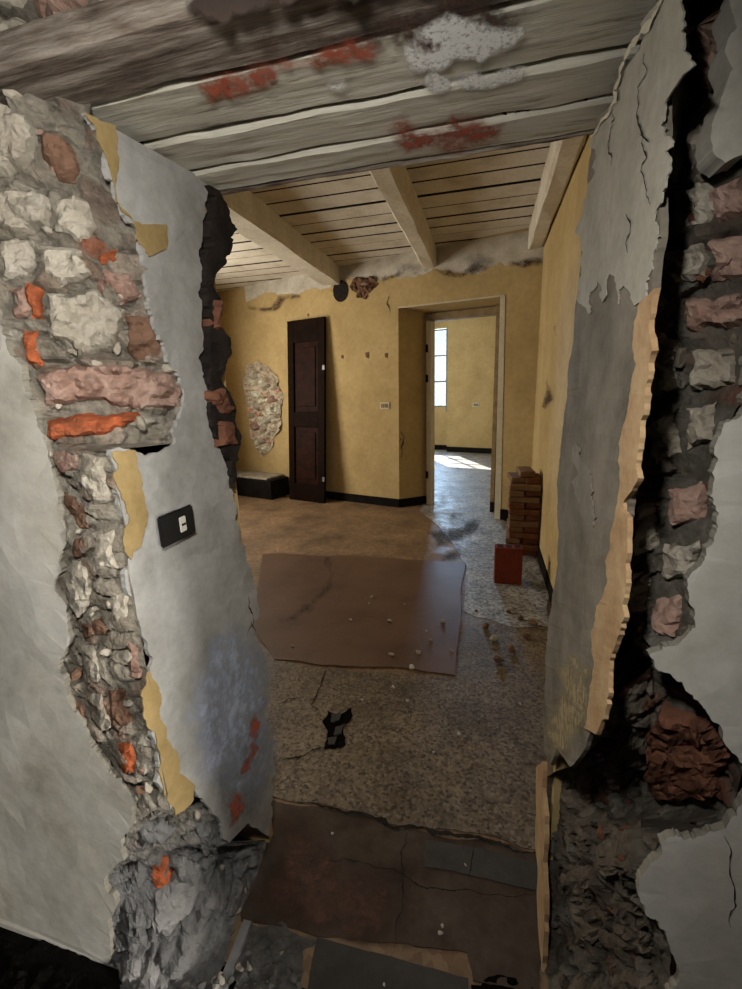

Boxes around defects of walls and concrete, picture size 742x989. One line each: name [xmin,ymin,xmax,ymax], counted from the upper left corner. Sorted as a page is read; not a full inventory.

spalling [0,0,102,31]
spalling [198,185,283,488]
spalling [349,276,379,299]
spalling [0,89,267,989]
spalling [535,0,742,989]